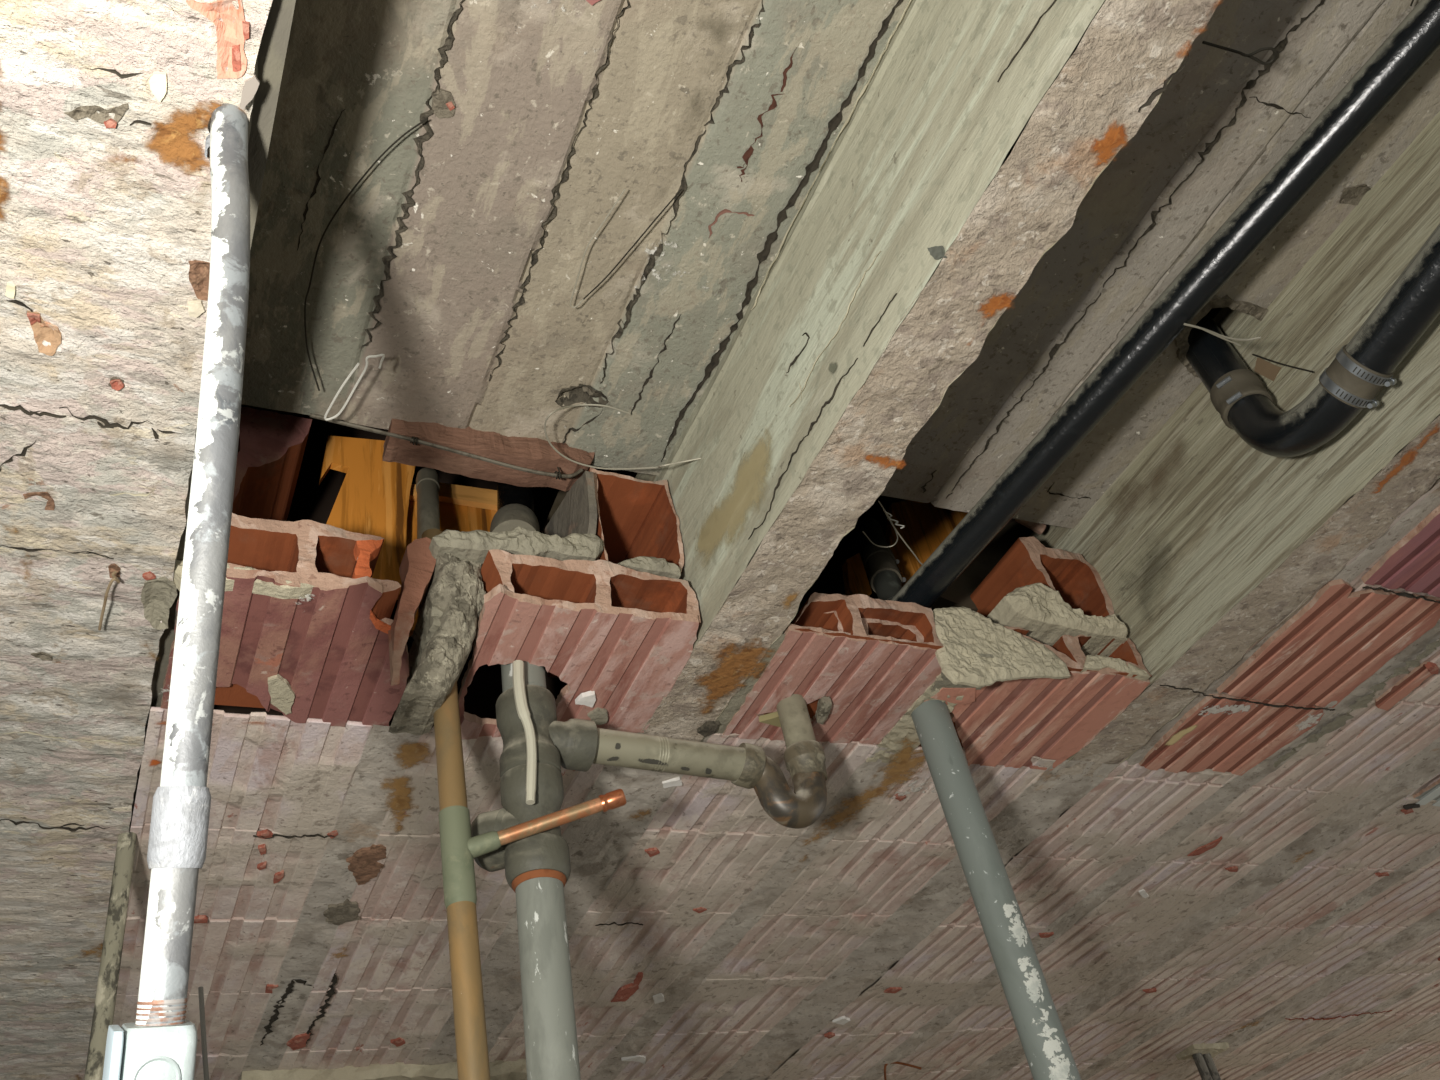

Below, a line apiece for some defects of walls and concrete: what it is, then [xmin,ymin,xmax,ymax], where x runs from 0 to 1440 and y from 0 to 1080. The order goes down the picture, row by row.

rust [0,177,9,219]
rust [147,102,221,172]
crack [361,0,464,349]
crack [562,0,912,462]
rust [1091,125,1127,165]
crack [921,0,1325,499]
crack [0,404,185,439]
spalling [352,539,383,579]
spalling [697,720,720,737]
rust [696,639,772,714]
spalling [1273,638,1440,768]
peeling [662,777,682,788]